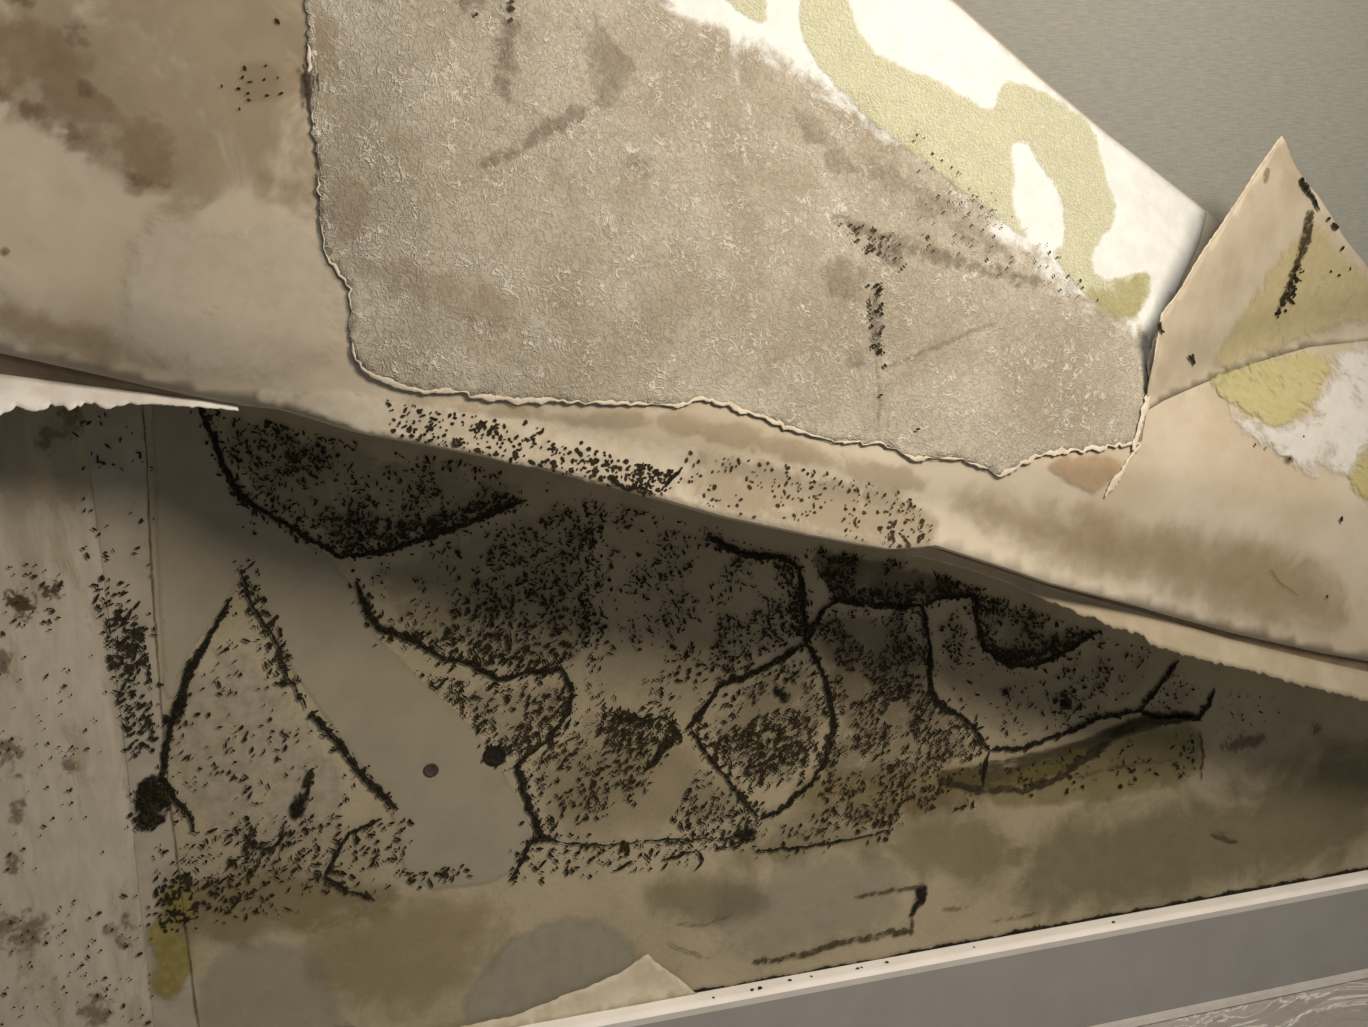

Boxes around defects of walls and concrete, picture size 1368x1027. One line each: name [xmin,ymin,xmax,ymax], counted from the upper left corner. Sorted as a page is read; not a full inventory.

damp [0,0,325,198]
damp [35,406,106,450]
damp [82,426,153,471]
damp [0,497,391,1026]
crack [127,568,414,902]
damp [407,864,473,889]
crack [190,407,1215,885]
damp [209,399,1328,884]